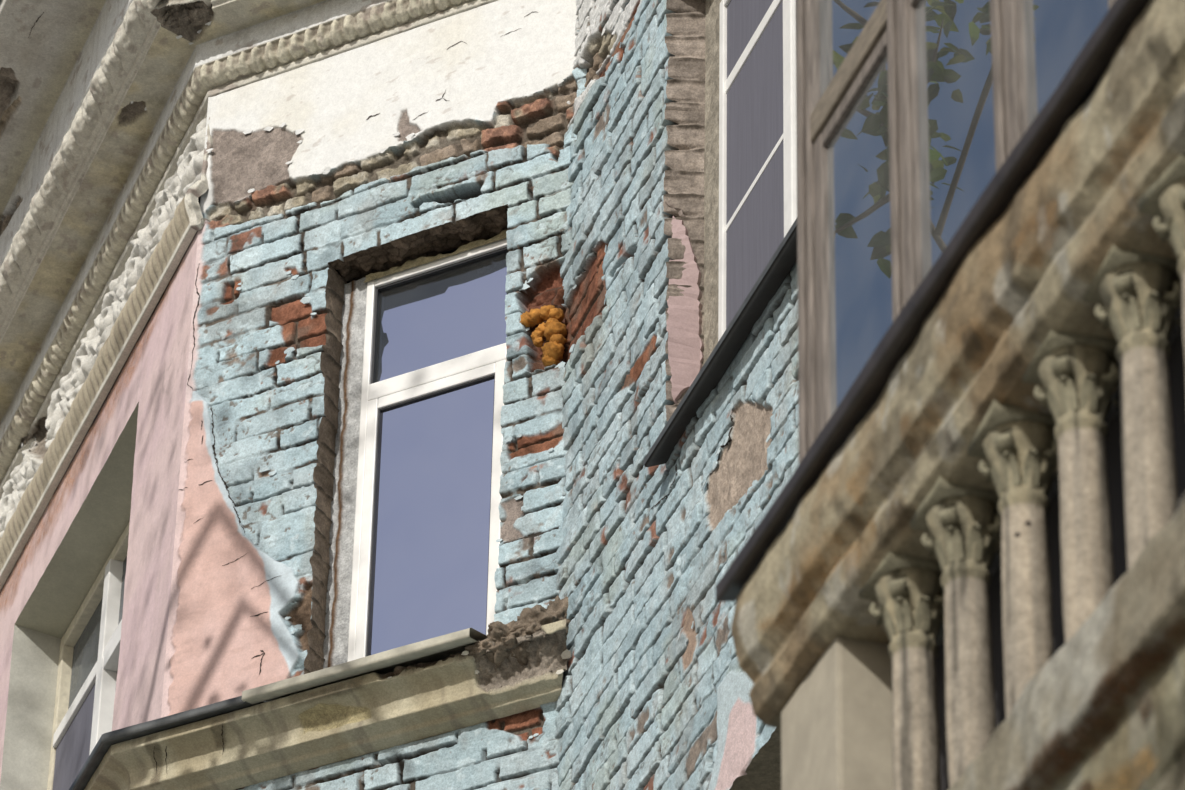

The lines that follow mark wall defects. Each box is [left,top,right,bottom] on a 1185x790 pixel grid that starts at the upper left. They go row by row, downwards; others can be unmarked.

spalling [150,0,214,45]
spalling [0,67,21,139]
spalling [118,101,147,127]
spalling [206,0,640,230]
spalling [222,280,242,305]
spalling [266,295,330,369]
spalling [518,236,609,373]
spalling [620,201,704,405]
spalling [505,423,565,460]
spalling [496,495,524,542]
spalling [280,582,313,652]
spalling [376,595,571,693]